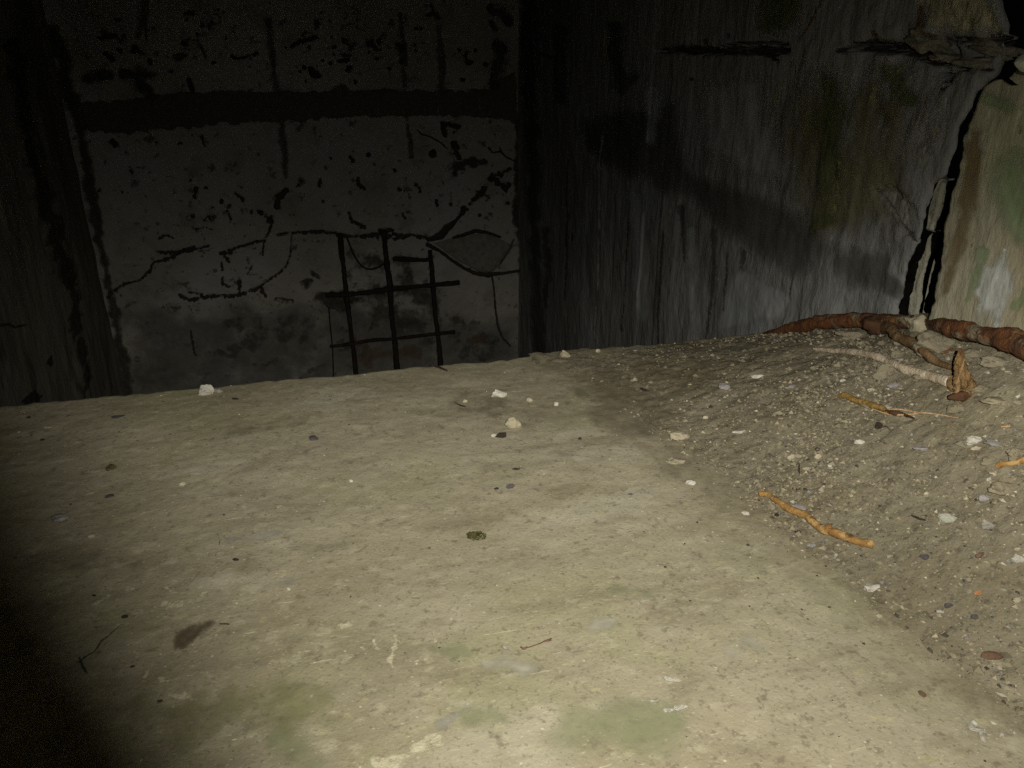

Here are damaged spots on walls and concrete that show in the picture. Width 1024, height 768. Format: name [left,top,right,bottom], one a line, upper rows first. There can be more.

spalling [904,28,961,63]
crack [106,210,429,302]
spalling [315,229,460,377]
crack [899,180,957,315]
water stain [975,249,1012,328]
water stain [175,621,212,649]